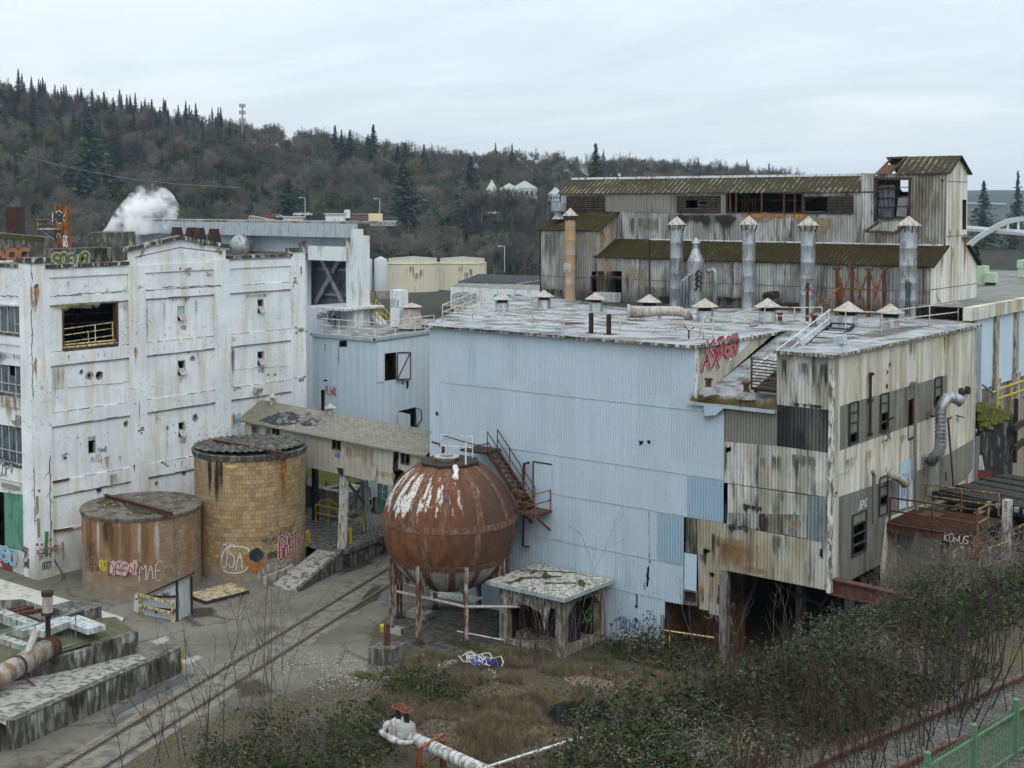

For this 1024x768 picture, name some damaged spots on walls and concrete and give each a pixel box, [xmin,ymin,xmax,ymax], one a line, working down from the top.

damp [208,461,223,496]